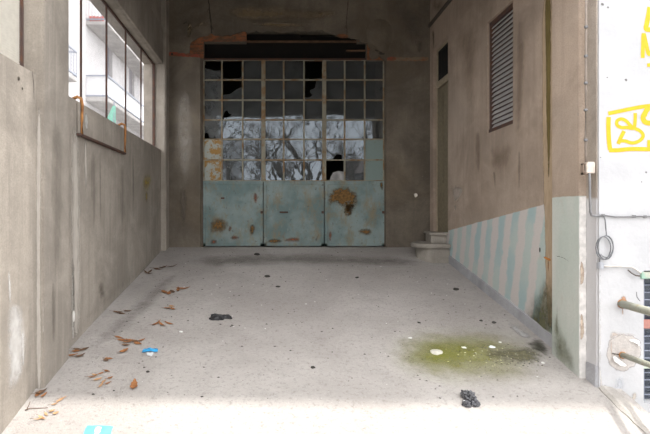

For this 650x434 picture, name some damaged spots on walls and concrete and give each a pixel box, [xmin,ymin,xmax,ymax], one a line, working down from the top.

flaking render [169,32,247,58]
rust [329,188,357,215]
rust [212,220,238,239]
flaking render [599,324,641,371]